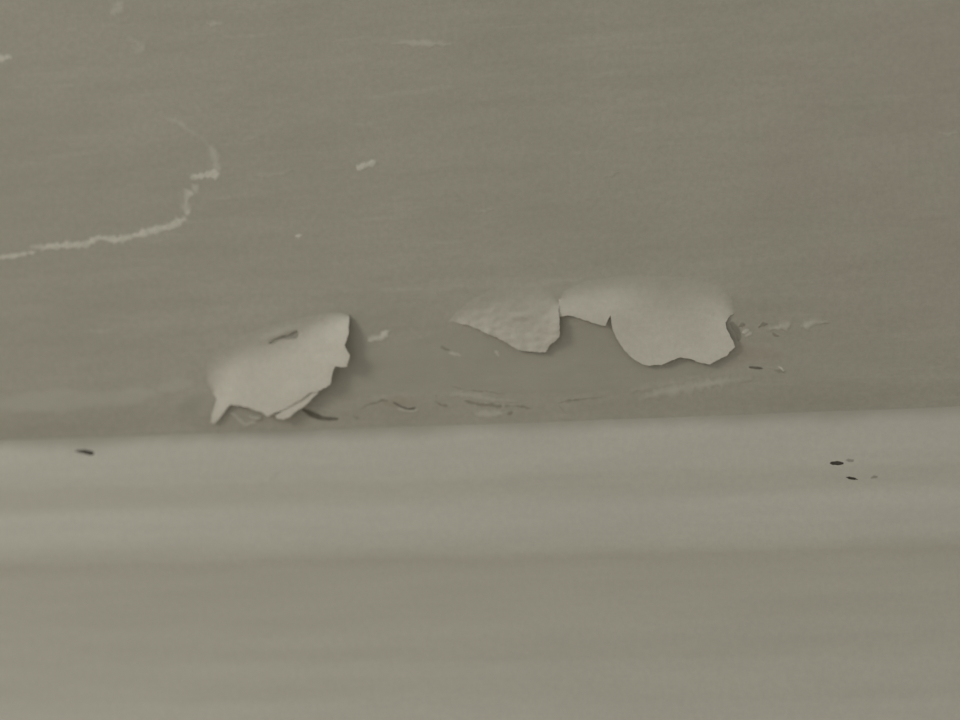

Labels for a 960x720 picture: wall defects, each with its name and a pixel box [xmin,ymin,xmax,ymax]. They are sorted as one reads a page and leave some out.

crack [0,111,233,261]
spalling [206,275,787,428]